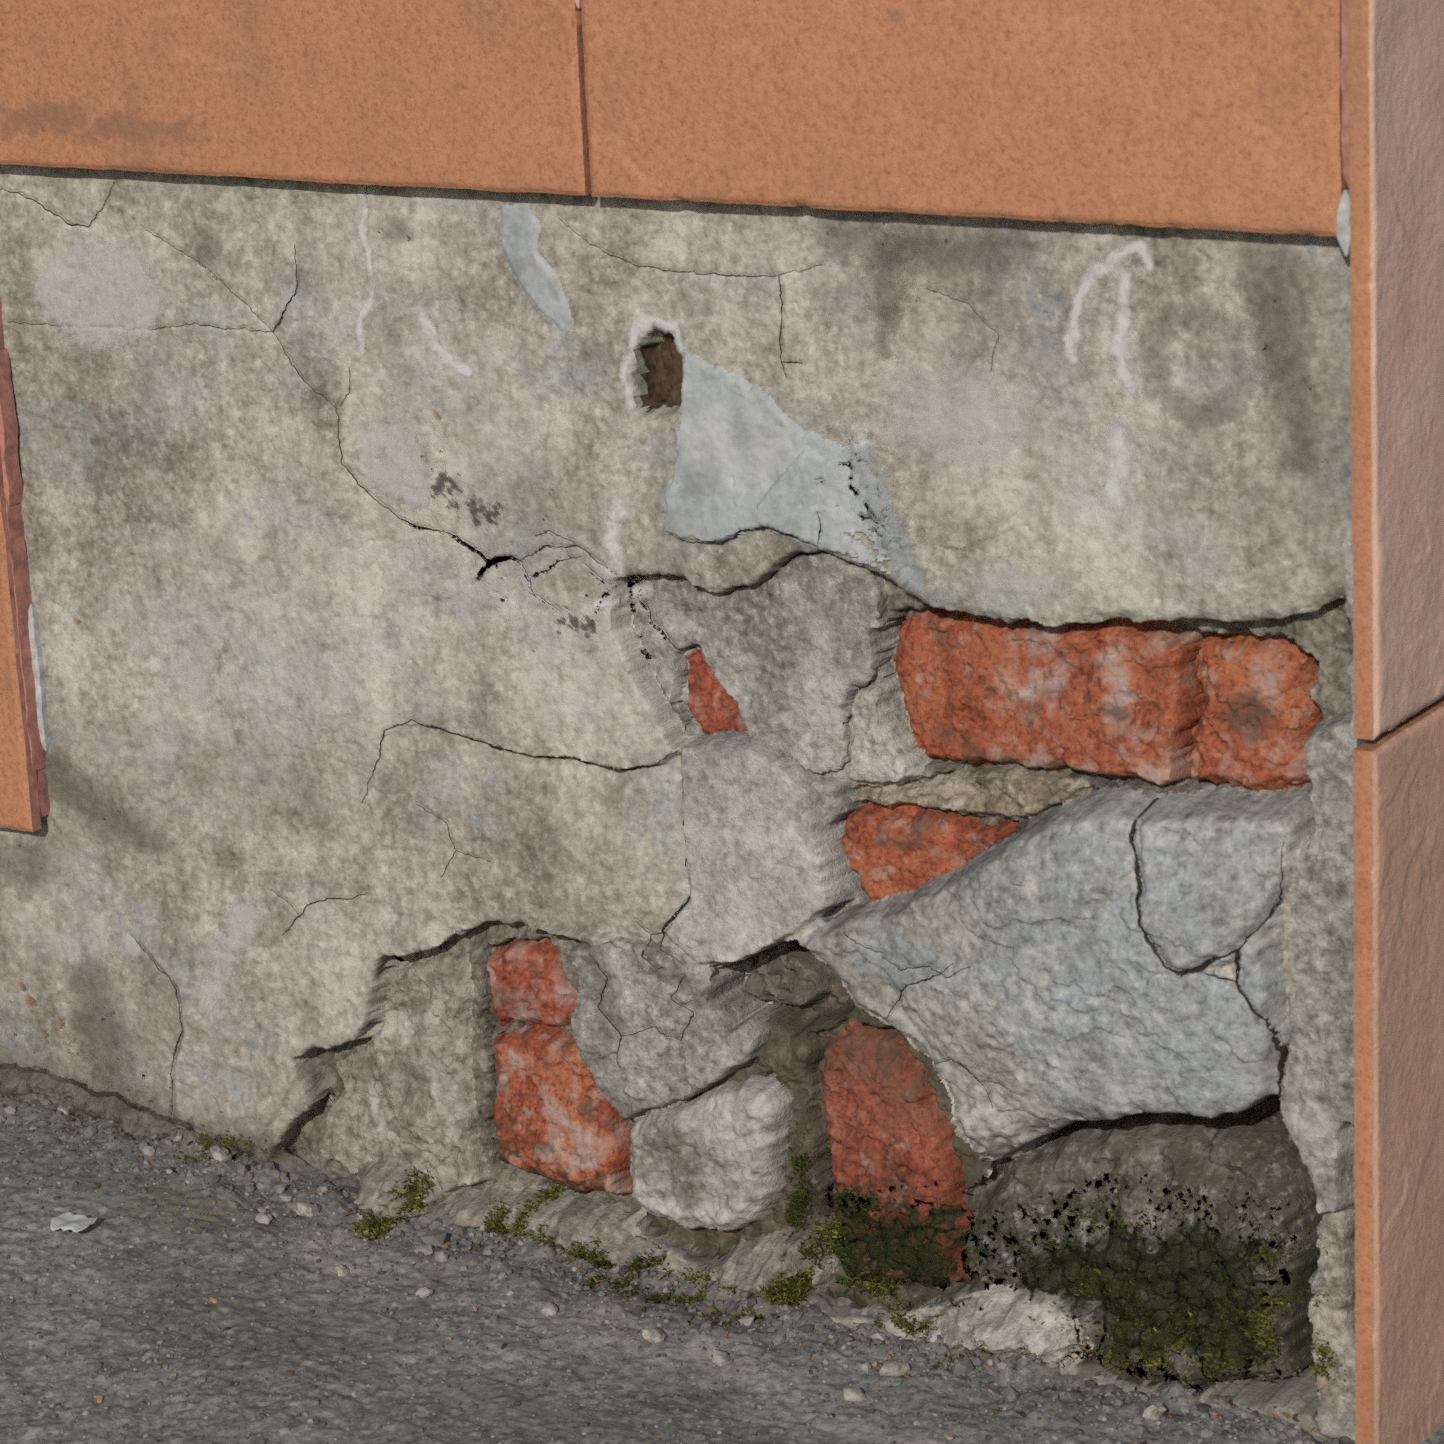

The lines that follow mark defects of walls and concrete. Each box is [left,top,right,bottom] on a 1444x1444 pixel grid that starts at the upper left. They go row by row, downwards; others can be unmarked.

crack [1,183,114,227]
peeling [499,202,574,334]
crack [559,218,822,378]
crack [109,230,702,654]
crack [669,512,821,546]
crack [131,934,182,1114]
crack [271,889,364,934]
crack [362,719,694,1065]
spalling [287,353,1367,1443]
crack [843,931,971,1018]
crack [934,1059,993,1108]
crack [1129,798,1289,1098]